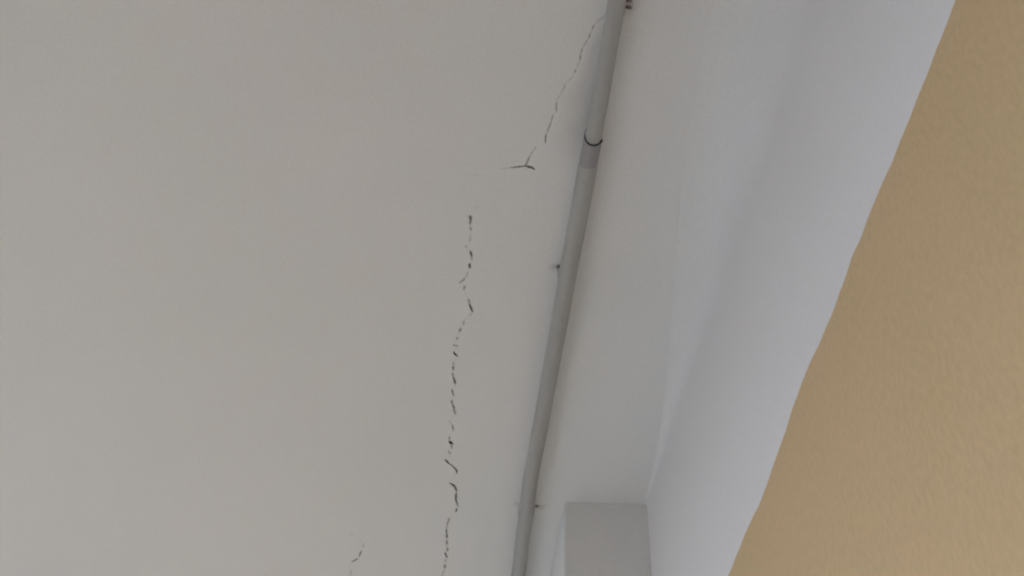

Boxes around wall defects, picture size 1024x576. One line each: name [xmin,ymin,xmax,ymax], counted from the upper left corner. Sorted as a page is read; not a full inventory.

crack [443,441,458,557]